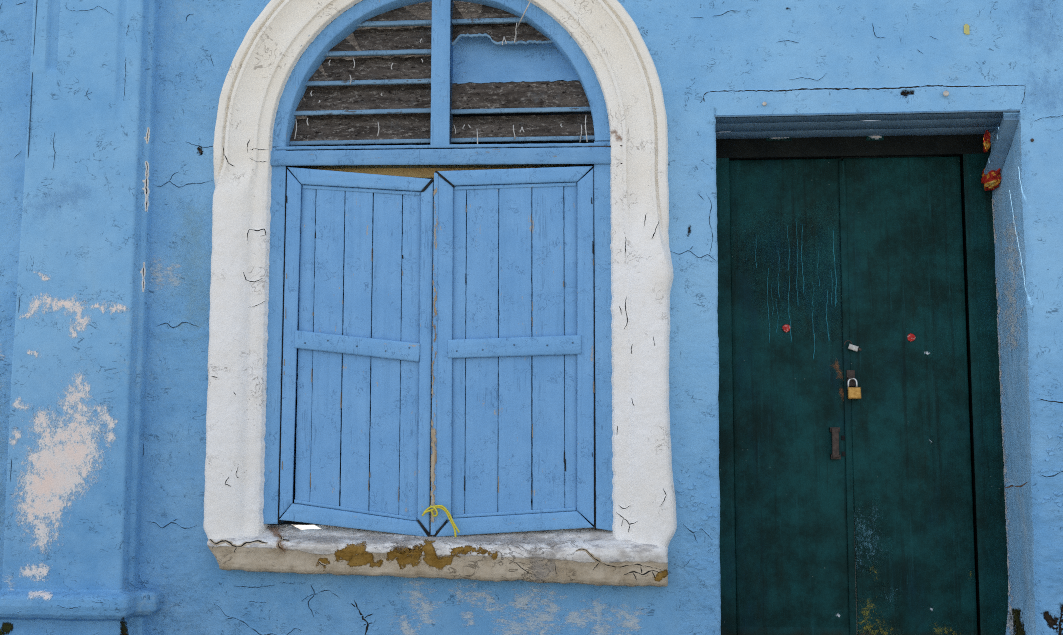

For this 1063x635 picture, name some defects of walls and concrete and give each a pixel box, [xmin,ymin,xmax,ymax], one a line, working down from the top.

peeling [18,271,129,339]
crack [1037,397,1063,405]
peeling [4,366,118,600]
crack [1004,470,1063,490]
crack [147,518,289,553]
spalling [316,539,499,571]
crack [213,560,375,635]
crack [1054,609,1063,635]